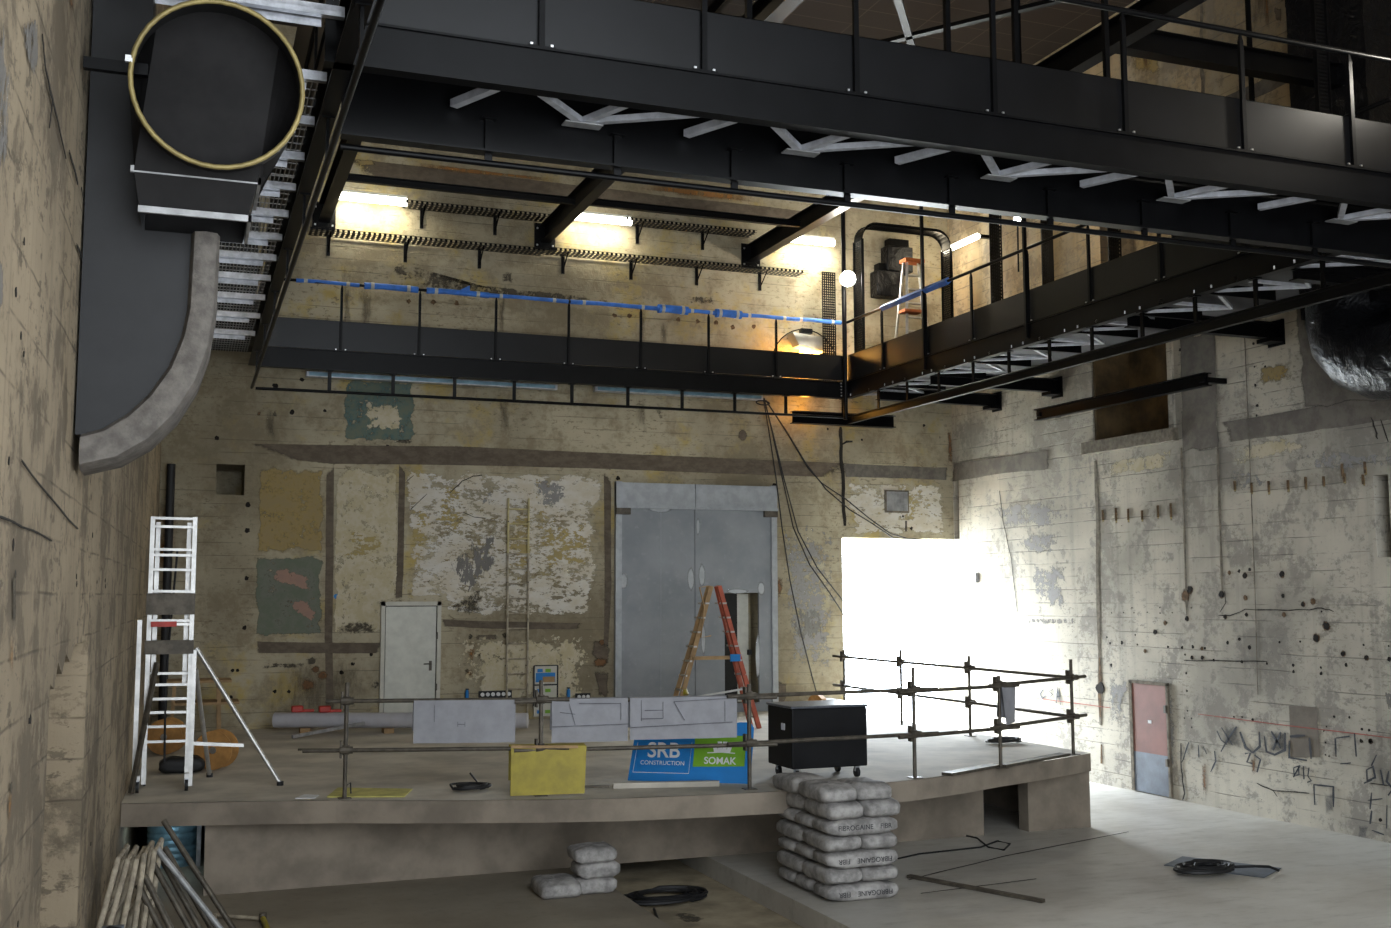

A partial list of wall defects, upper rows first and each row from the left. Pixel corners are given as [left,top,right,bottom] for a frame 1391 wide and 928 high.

peeling [255,468,604,636]
peeling [458,634,609,698]